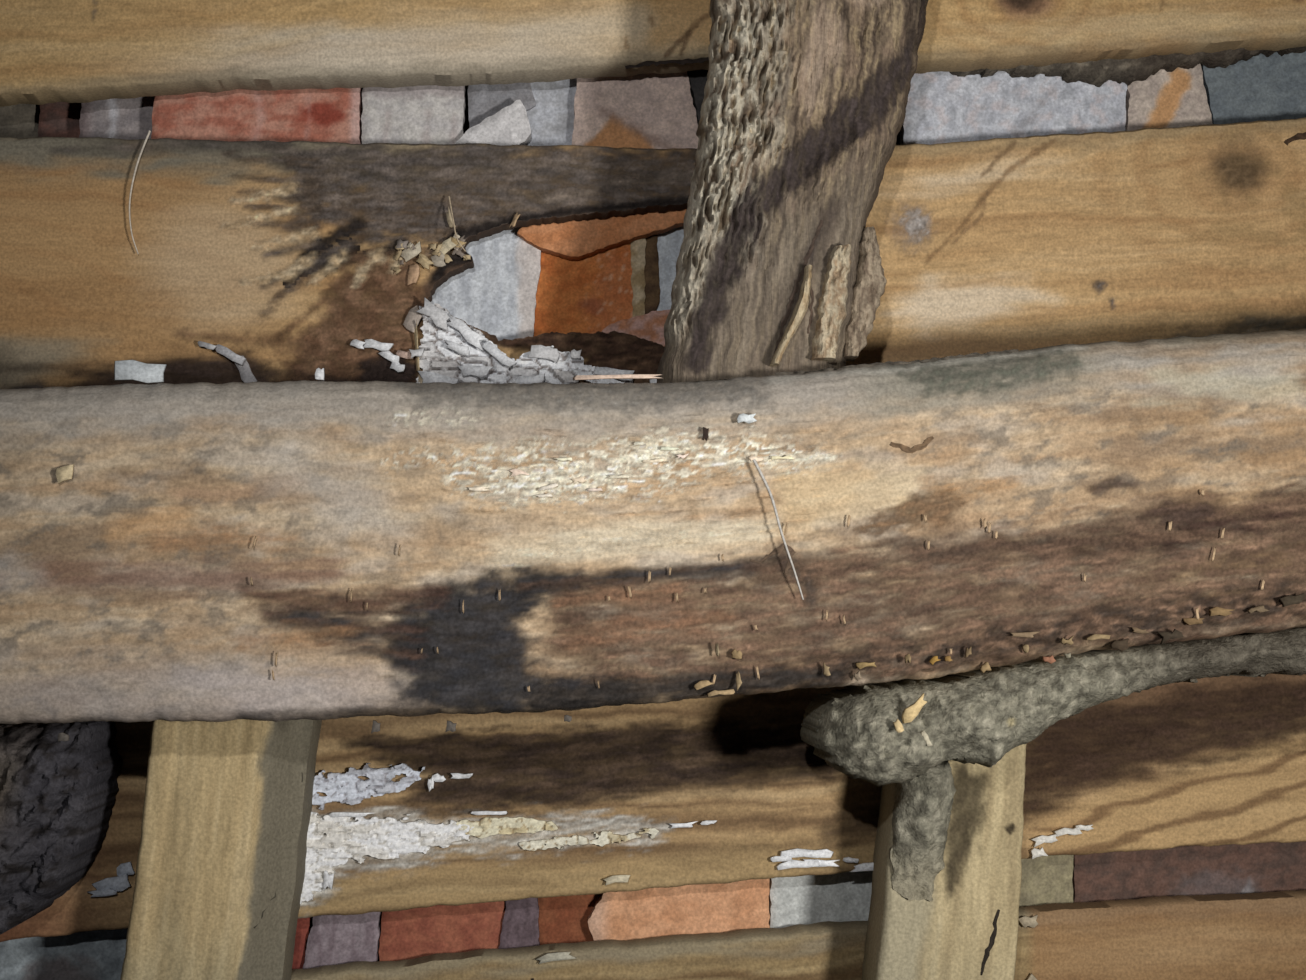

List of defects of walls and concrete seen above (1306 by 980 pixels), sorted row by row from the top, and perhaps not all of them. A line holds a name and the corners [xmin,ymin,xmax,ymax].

water stain [170,140,697,284]
water stain [64,354,280,387]
water stain [324,356,431,401]
peeling [350,297,581,384]
peeling [593,367,635,381]
peeling [386,427,836,508]
water stain [243,483,1306,714]
peeling [312,763,473,817]
water stain [348,721,840,811]
water stain [1023,684,1306,814]
peeling [456,811,717,851]